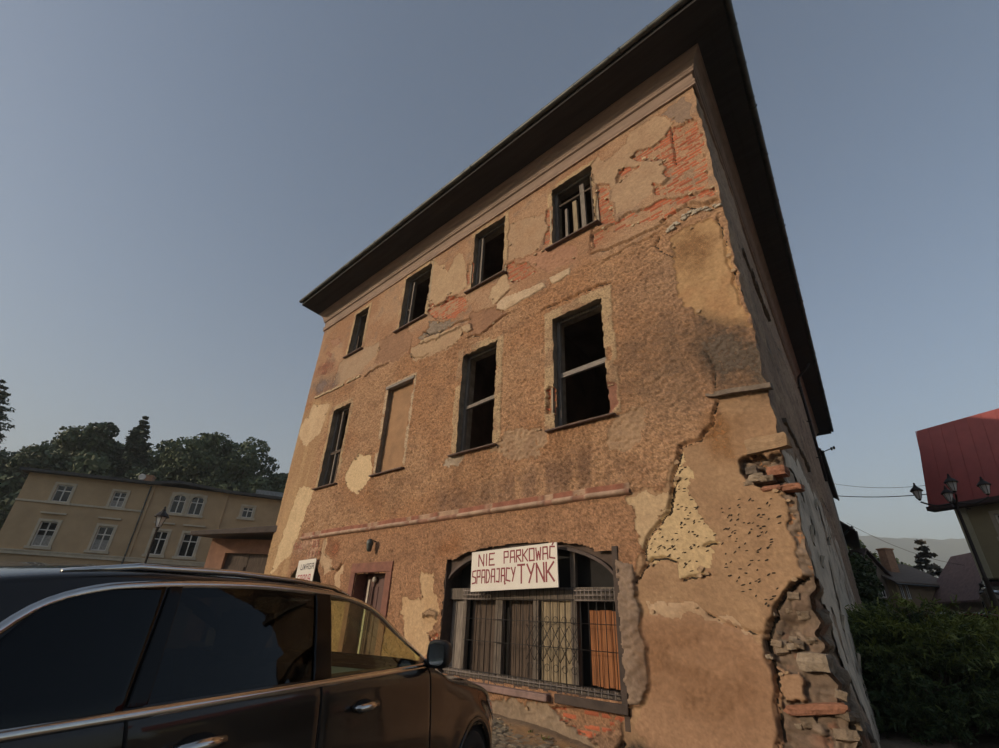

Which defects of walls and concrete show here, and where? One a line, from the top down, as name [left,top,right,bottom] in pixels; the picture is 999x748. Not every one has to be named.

flaking render [591,116,716,248]
flaking render [410,210,578,362]
flaking render [270,486,313,575]
flaking render [299,403,330,446]
flaking render [345,454,373,494]
flaking render [400,571,440,660]
crack [636,353,719,583]
flaking render [490,382,880,748]